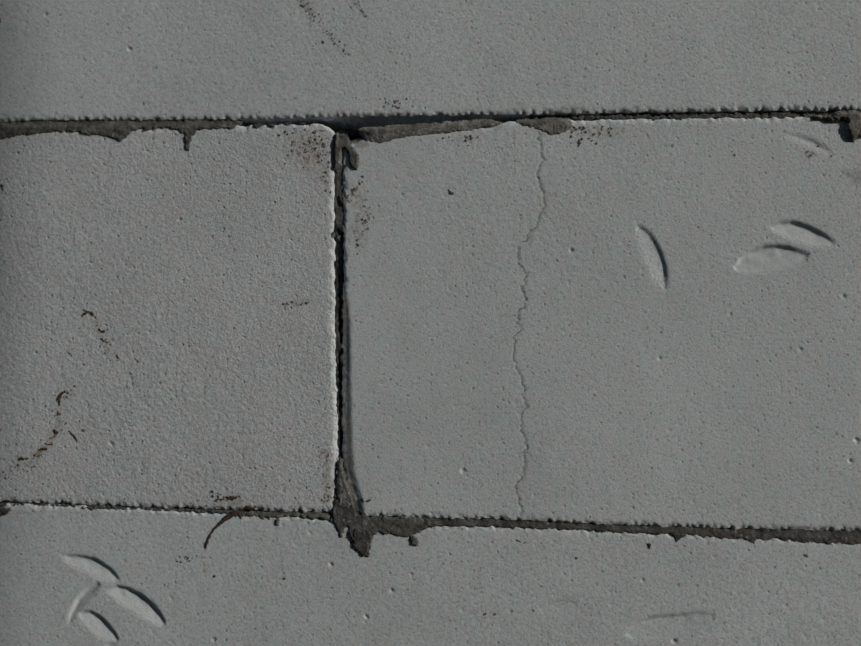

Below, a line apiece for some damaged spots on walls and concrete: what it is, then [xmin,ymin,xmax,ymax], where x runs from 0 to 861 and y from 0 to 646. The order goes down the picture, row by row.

rust [0,385,85,479]
crack [512,133,546,517]